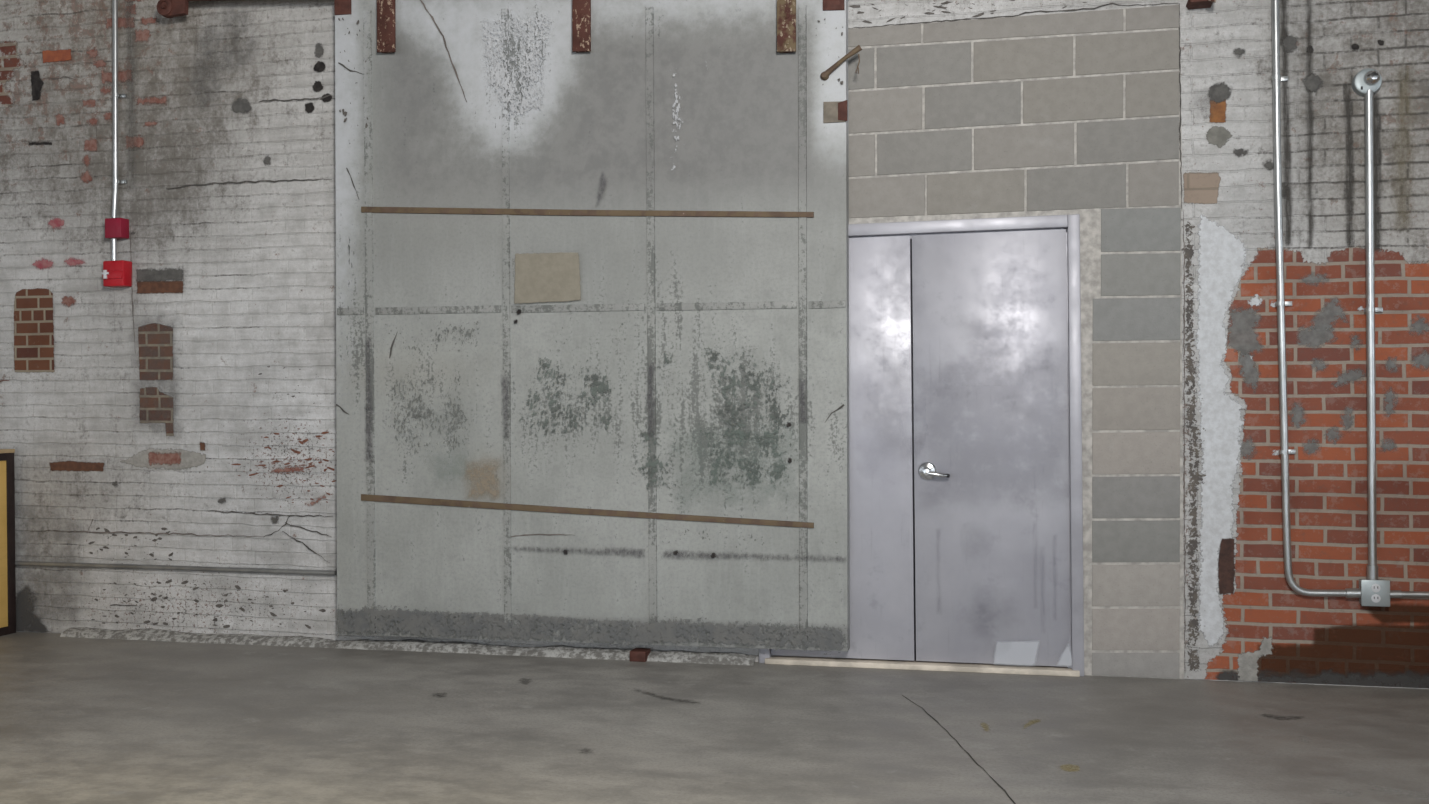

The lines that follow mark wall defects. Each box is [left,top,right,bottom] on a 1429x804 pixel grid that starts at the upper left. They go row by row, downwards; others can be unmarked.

flaking render [0,41,26,108]
flaking render [42,48,132,184]
flaking render [106,0,157,42]
peeling [33,258,84,269]
flaking render [14,288,76,372]
flaking render [138,323,181,466]
flaking render [1182,172,1429,680]
crack [902,695,1016,804]